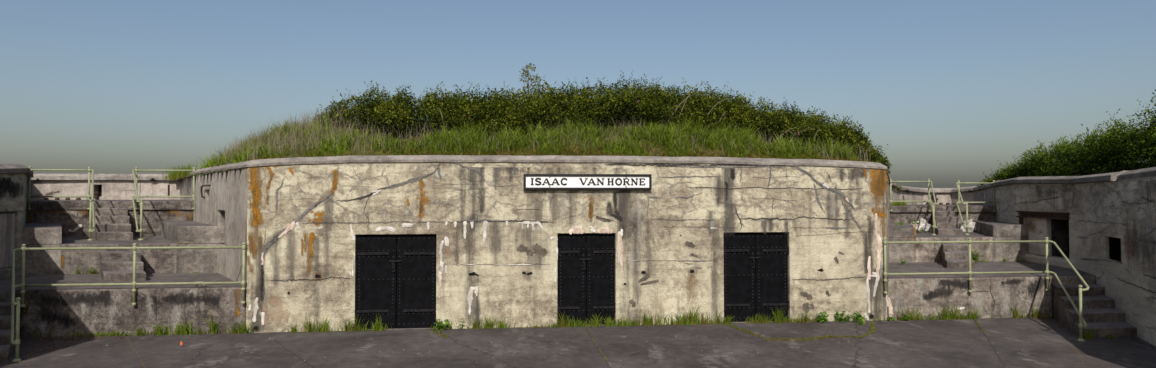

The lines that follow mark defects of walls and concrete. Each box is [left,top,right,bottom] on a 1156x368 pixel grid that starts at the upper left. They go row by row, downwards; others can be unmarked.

rust [246,166,294,272]
rust [301,170,338,274]
rust [397,179,428,219]
water stain [466,280,479,325]
crack [260,162,867,294]
rust [863,169,889,252]
crack [1018,193,1156,331]